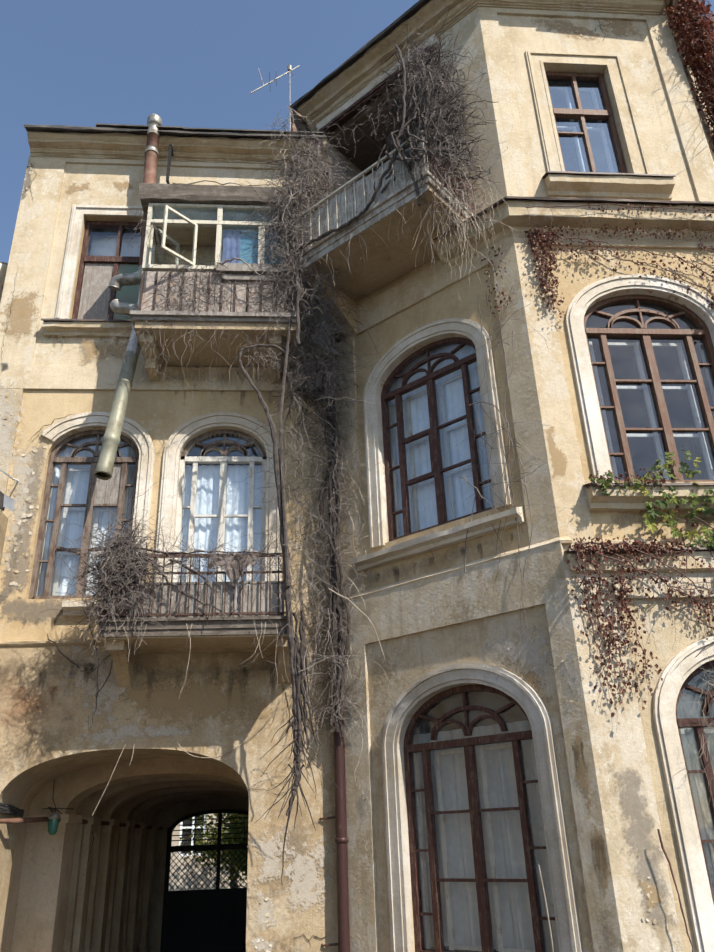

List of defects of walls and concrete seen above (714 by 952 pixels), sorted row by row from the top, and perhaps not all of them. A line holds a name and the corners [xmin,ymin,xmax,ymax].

peeling [0,292,39,343]
leakage [120,676,271,728]
peeling [247,825,336,952]